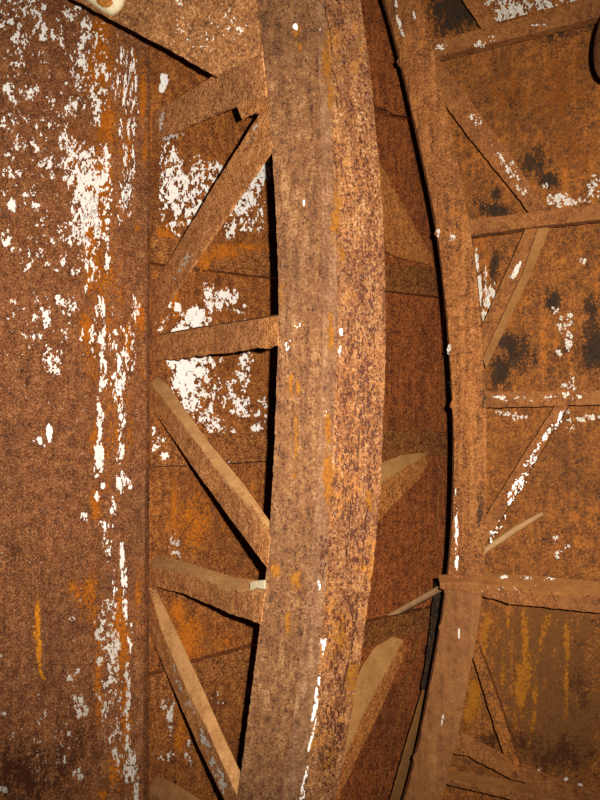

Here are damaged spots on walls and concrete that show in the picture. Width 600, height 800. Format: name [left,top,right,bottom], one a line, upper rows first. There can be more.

corrosion [96,0,113,8]
peeling [0,0,139,293]
corrosion [67,16,148,467]
peeling [159,112,224,237]
peeling [224,158,272,239]
peeling [2,292,78,375]
peeling [166,351,268,433]
corrosion [318,69,382,799]
peeling [79,295,140,800]
corrosion [33,601,45,680]
corrosion [98,567,144,800]
corrosion [482,605,570,746]